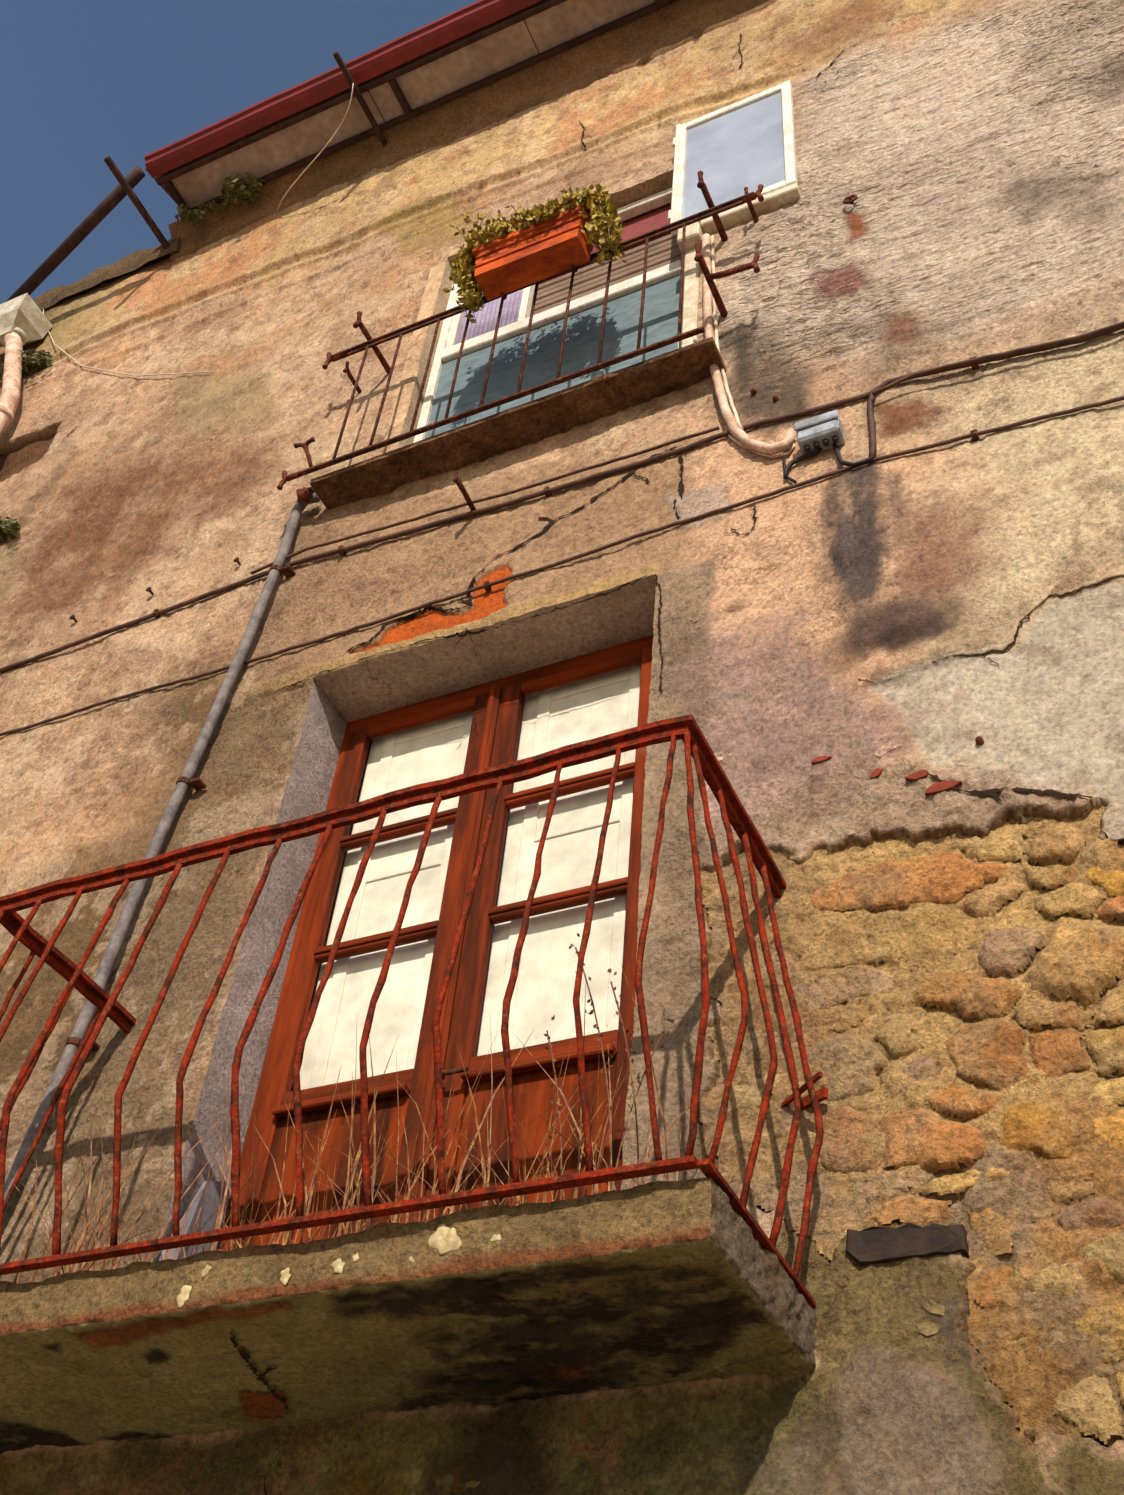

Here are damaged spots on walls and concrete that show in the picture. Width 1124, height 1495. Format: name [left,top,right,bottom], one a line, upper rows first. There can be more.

corrosion [815,269,866,297]
spalling [363,567,512,652]
crack [274,444,686,698]
damp [822,463,971,656]
crack [858,571,1124,684]
spalling [699,805,1124,1447]
damp [331,1253,359,1274]
crack [230,1332,288,1409]
damp [334,1265,764,1495]
damp [0,1423,81,1454]